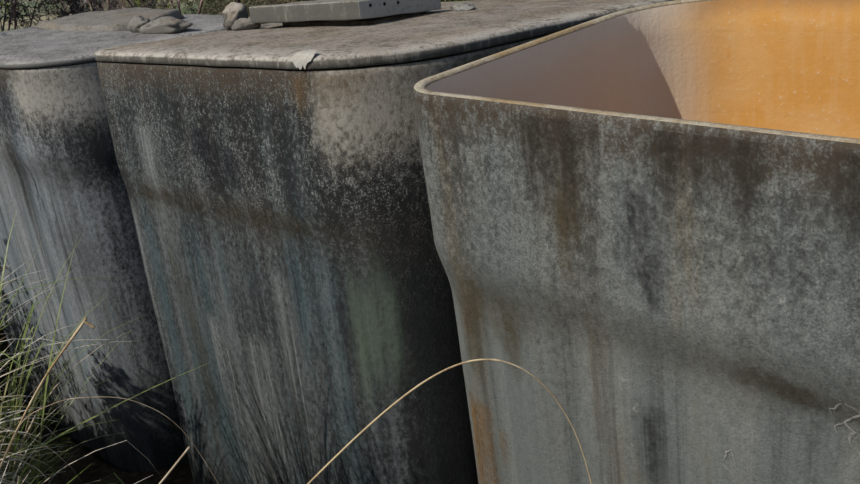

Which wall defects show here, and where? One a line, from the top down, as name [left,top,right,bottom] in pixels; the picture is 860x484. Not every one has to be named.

crack [830,404,860,441]